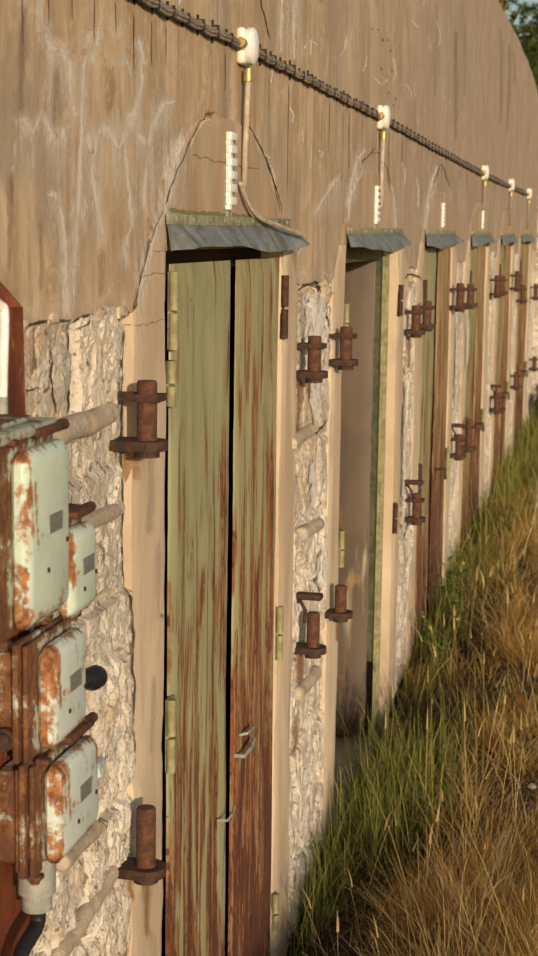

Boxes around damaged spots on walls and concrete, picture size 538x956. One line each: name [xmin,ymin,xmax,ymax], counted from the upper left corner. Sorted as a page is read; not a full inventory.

water stain [277,0,300,59]
water stain [12,0,185,317]
water stain [313,149,365,219]
water stain [421,166,442,232]
flaking render [23,305,129,332]
peeling [309,383,321,425]
crack [120,114,282,764]